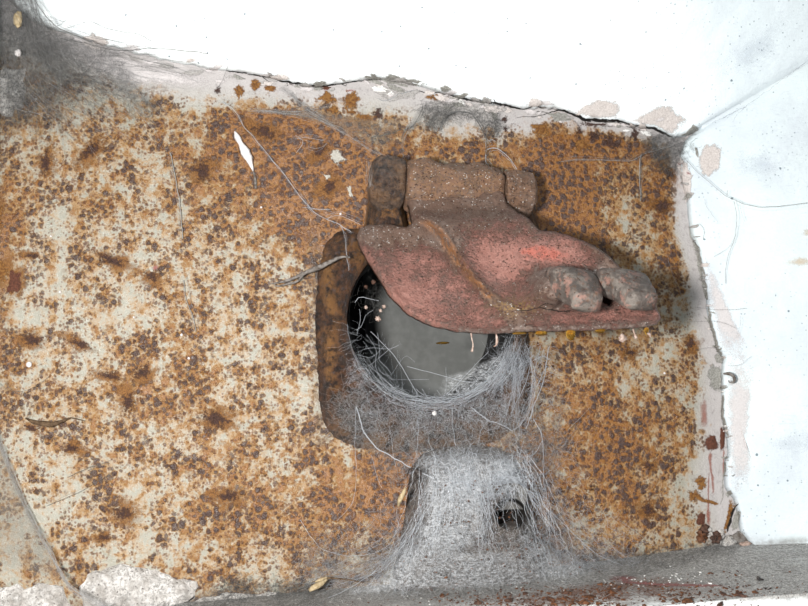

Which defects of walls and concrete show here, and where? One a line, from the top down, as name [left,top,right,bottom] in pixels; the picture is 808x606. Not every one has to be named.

corrosion [234,79,276,100]
crack [228,71,372,87]
corrosion [315,86,383,127]
flaking render [364,74,513,126]
crack [381,91,672,137]
spalling [523,98,699,136]
spalling [677,143,721,203]
corrosion [94,251,161,285]
corrosion [57,334,92,353]
corrosion [89,365,156,414]
corrosion [196,407,240,432]
corrosion [688,427,725,505]